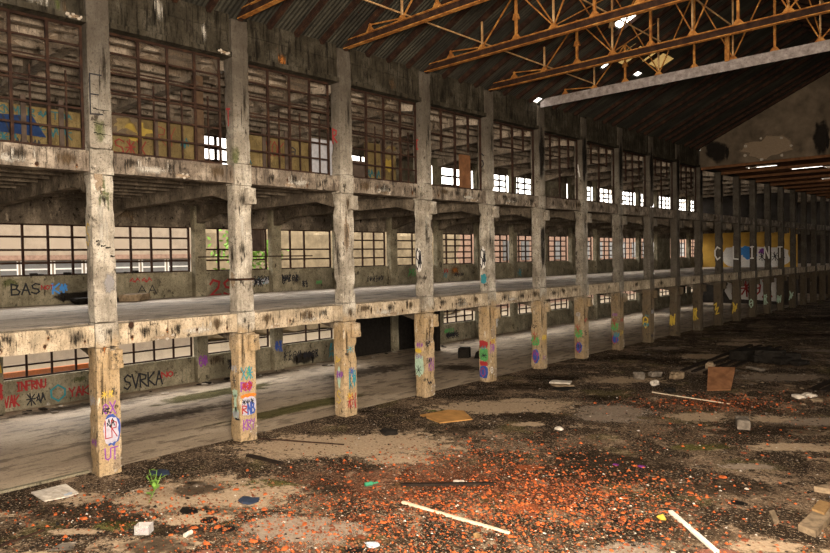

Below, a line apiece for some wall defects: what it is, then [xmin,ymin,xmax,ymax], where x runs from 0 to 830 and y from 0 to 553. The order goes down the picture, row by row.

water stain [1,147,35,161]
water stain [57,153,75,165]